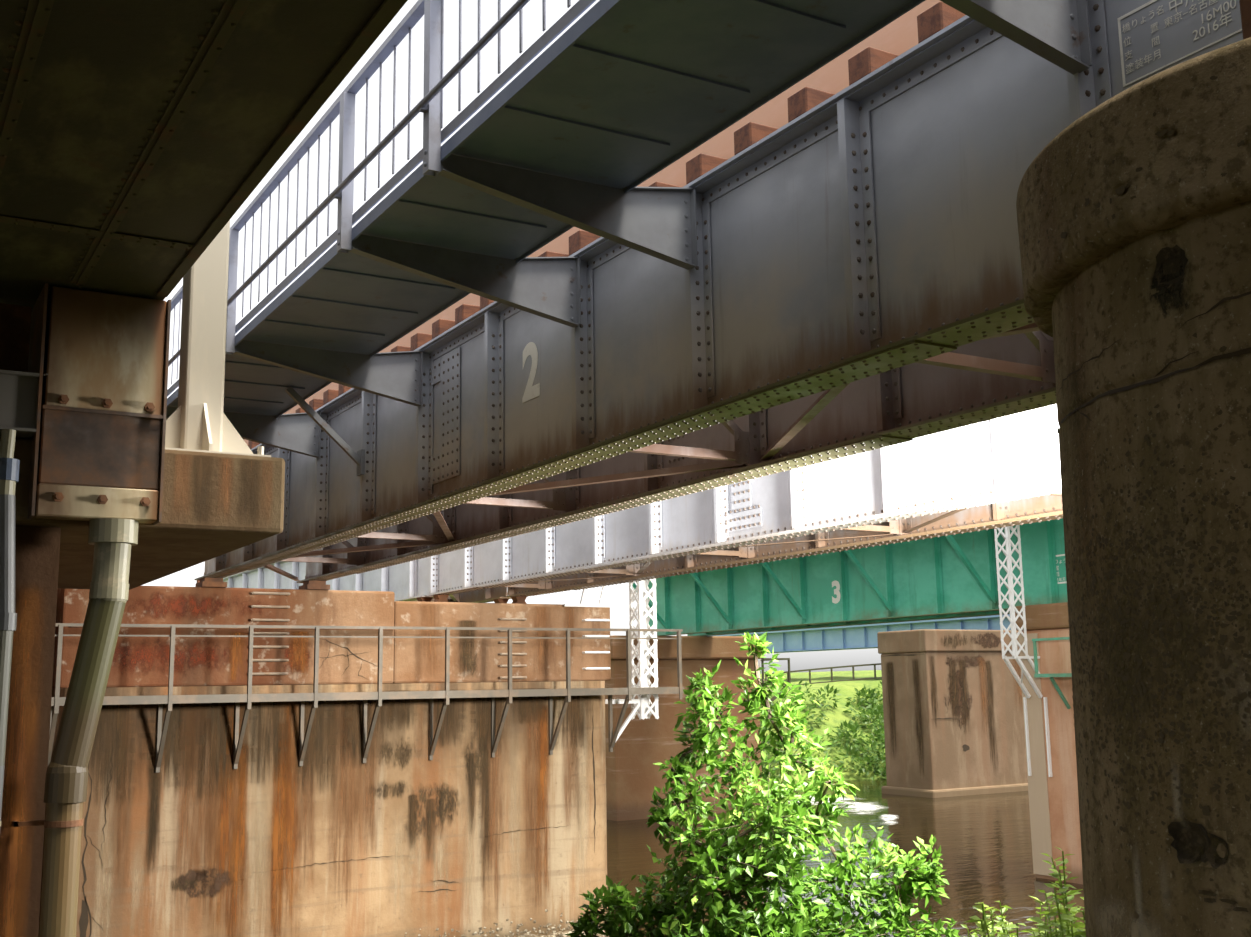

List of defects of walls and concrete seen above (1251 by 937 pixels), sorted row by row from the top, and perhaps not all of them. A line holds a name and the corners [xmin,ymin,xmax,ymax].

spalling [1149,245,1188,314]
crack [1057,291,1251,433]
corrosion [0,593,36,937]
corrosion [112,633,242,680]
water stain [134,702,232,897]
corrosion [176,705,248,934]
corrosion [271,704,313,931]
water stain [247,691,412,785]
crack [320,639,385,679]
water stain [375,697,502,894]
water stain [913,633,1000,764]
spalling [1168,806,1248,912]